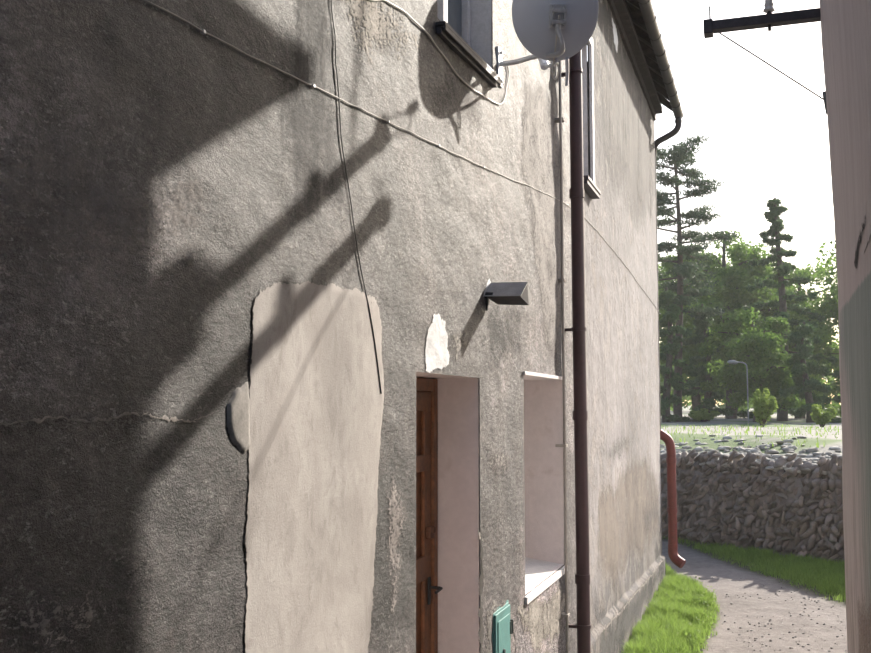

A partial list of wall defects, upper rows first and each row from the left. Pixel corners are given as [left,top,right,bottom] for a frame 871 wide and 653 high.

crack [0,410,219,430]